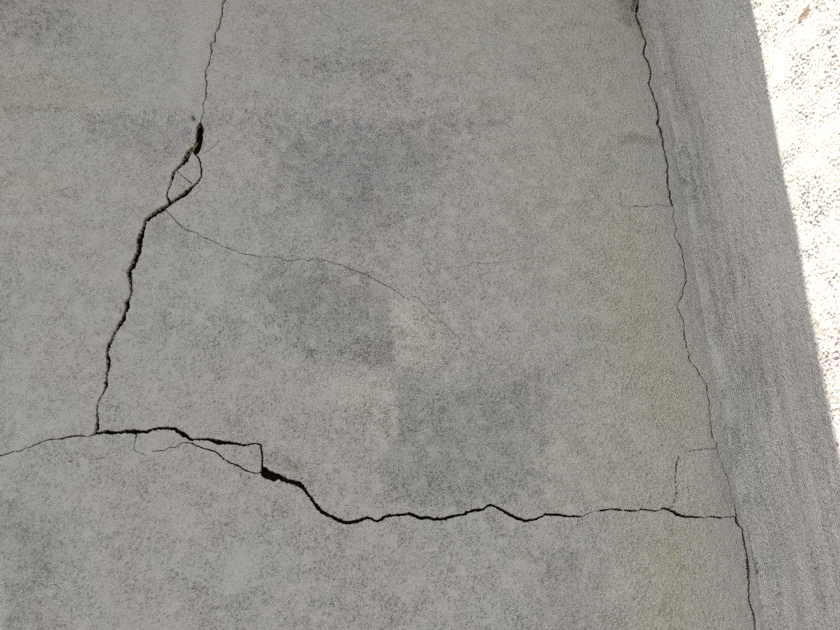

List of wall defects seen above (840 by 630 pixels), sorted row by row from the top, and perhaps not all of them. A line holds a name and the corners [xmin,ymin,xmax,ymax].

crack [200,0,226,127]
crack [0,140,460,474]
crack [281,0,756,630]